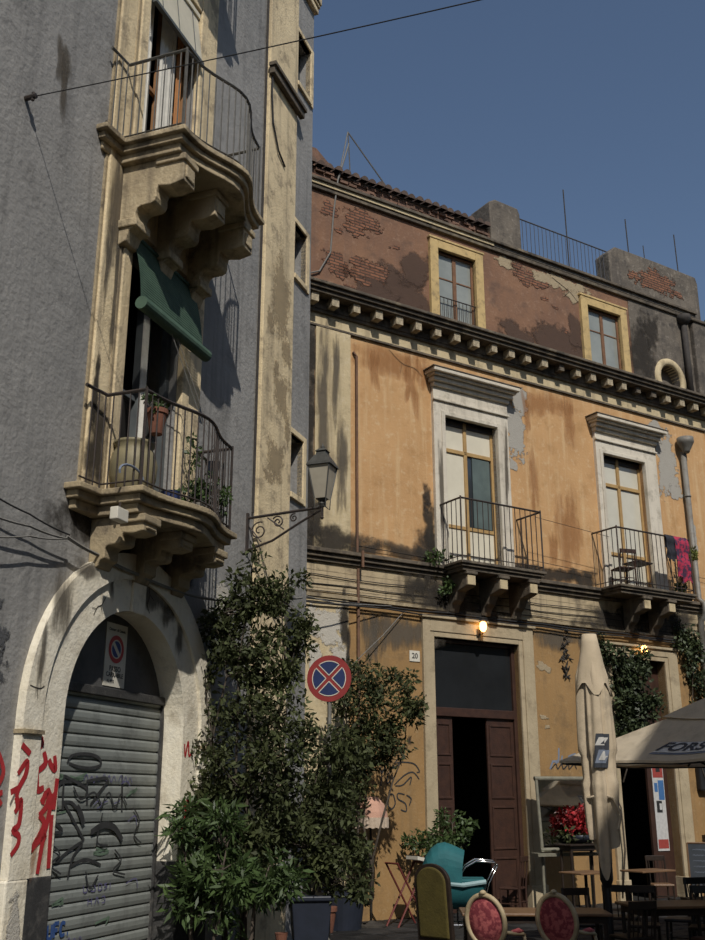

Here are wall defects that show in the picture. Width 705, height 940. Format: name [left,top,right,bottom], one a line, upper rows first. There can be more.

water stain [57,39,70,111]
spalling [320,199,384,239]
spalling [321,247,390,289]
peeling [494,255,593,310]
spalling [627,266,684,300]
water stain [630,314,658,379]
water stain [307,337,445,563]
peeling [507,386,528,471]
peeling [648,419,684,502]
water stain [401,572,521,626]